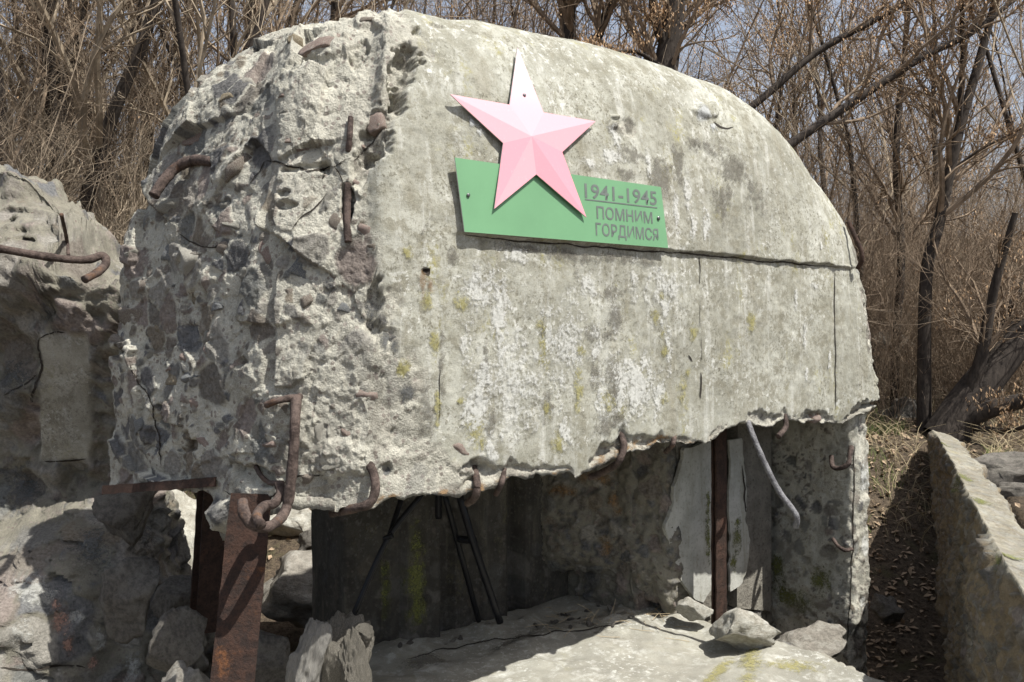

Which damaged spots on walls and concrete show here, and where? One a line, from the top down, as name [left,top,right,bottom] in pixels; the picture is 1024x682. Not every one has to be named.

spalling [149,154,211,199]
crack [250,137,376,229]
spalling [343,116,390,243]
crack [180,234,217,248]
crack [5,331,66,403]
crack [129,362,161,464]
spalling [237,393,303,533]
spalling [328,461,390,518]
spalling [442,465,519,507]
spalling [588,432,645,481]
peeling [662,436,711,602]
peeling [727,420,800,592]